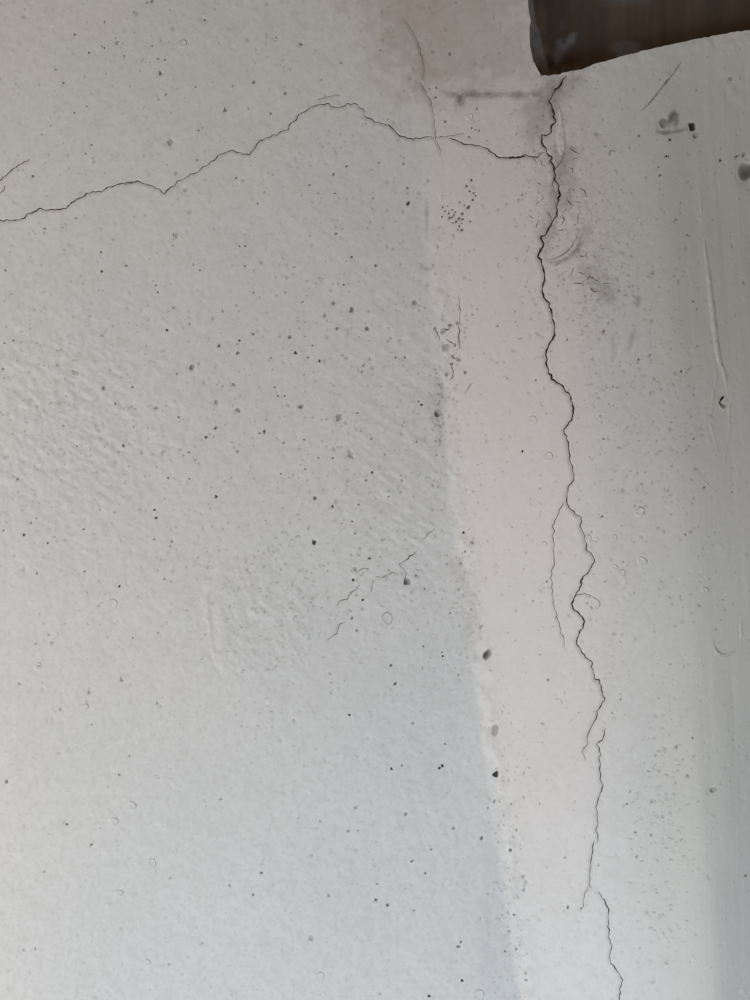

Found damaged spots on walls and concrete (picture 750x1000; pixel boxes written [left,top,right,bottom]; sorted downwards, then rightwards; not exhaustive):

crack [0,20,605,908]
crack [600,894,623,1000]